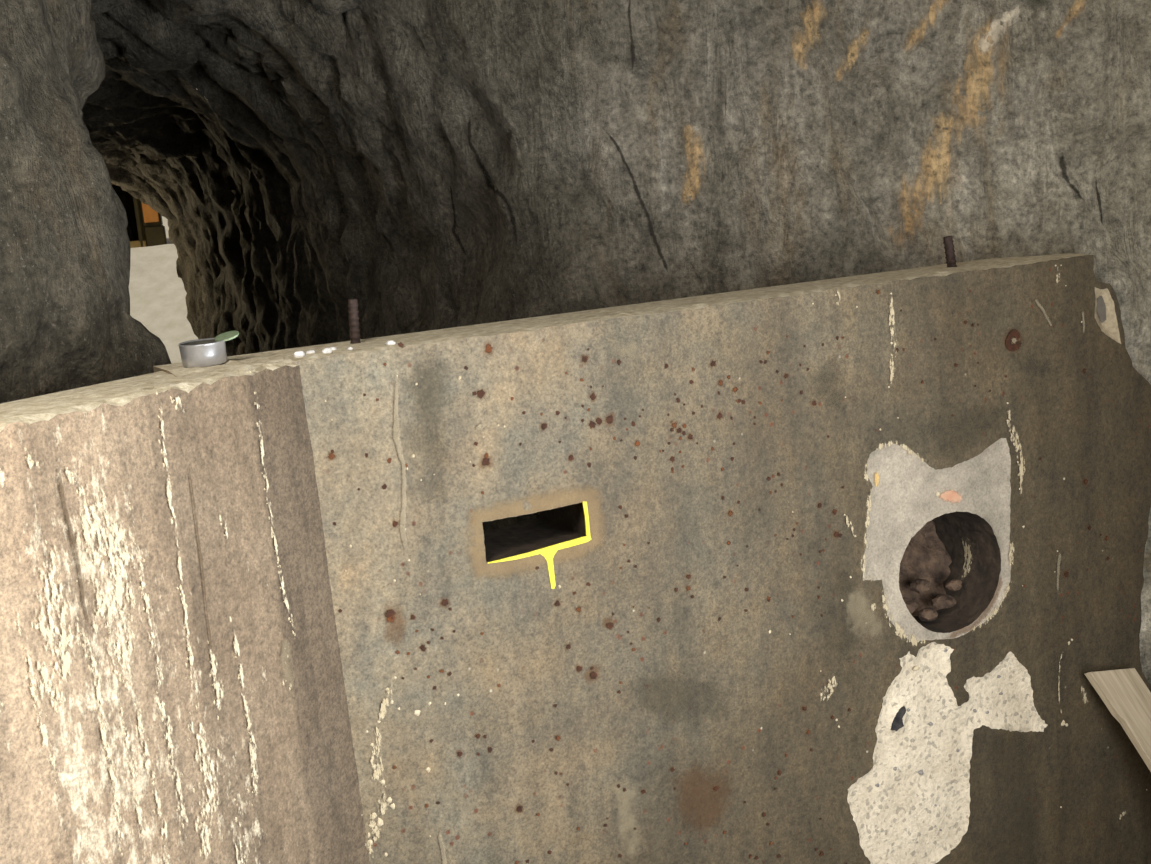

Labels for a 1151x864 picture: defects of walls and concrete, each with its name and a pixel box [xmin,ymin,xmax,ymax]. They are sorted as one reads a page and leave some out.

crack [627,0,635,73]
crack [468,122,517,240]
crack [609,135,667,269]
rust [1006,329,1021,351]
rust [580,378,644,460]
rust [659,393,703,473]
water stain [156,391,197,688]
water stain [254,392,296,636]
water stain [14,484,223,858]
rust [396,615,455,690]
spalling [847,438,1047,864]
water stain [234,636,259,864]